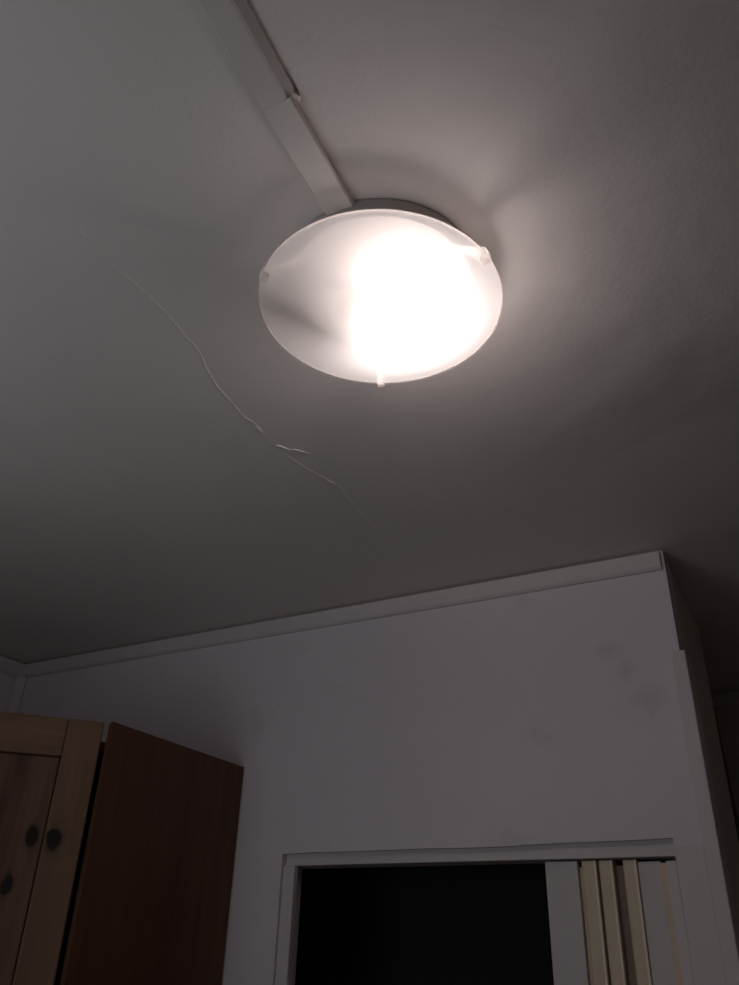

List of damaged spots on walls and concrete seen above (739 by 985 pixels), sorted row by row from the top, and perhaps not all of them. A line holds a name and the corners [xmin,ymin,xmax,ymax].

crack [0,163,383,539]